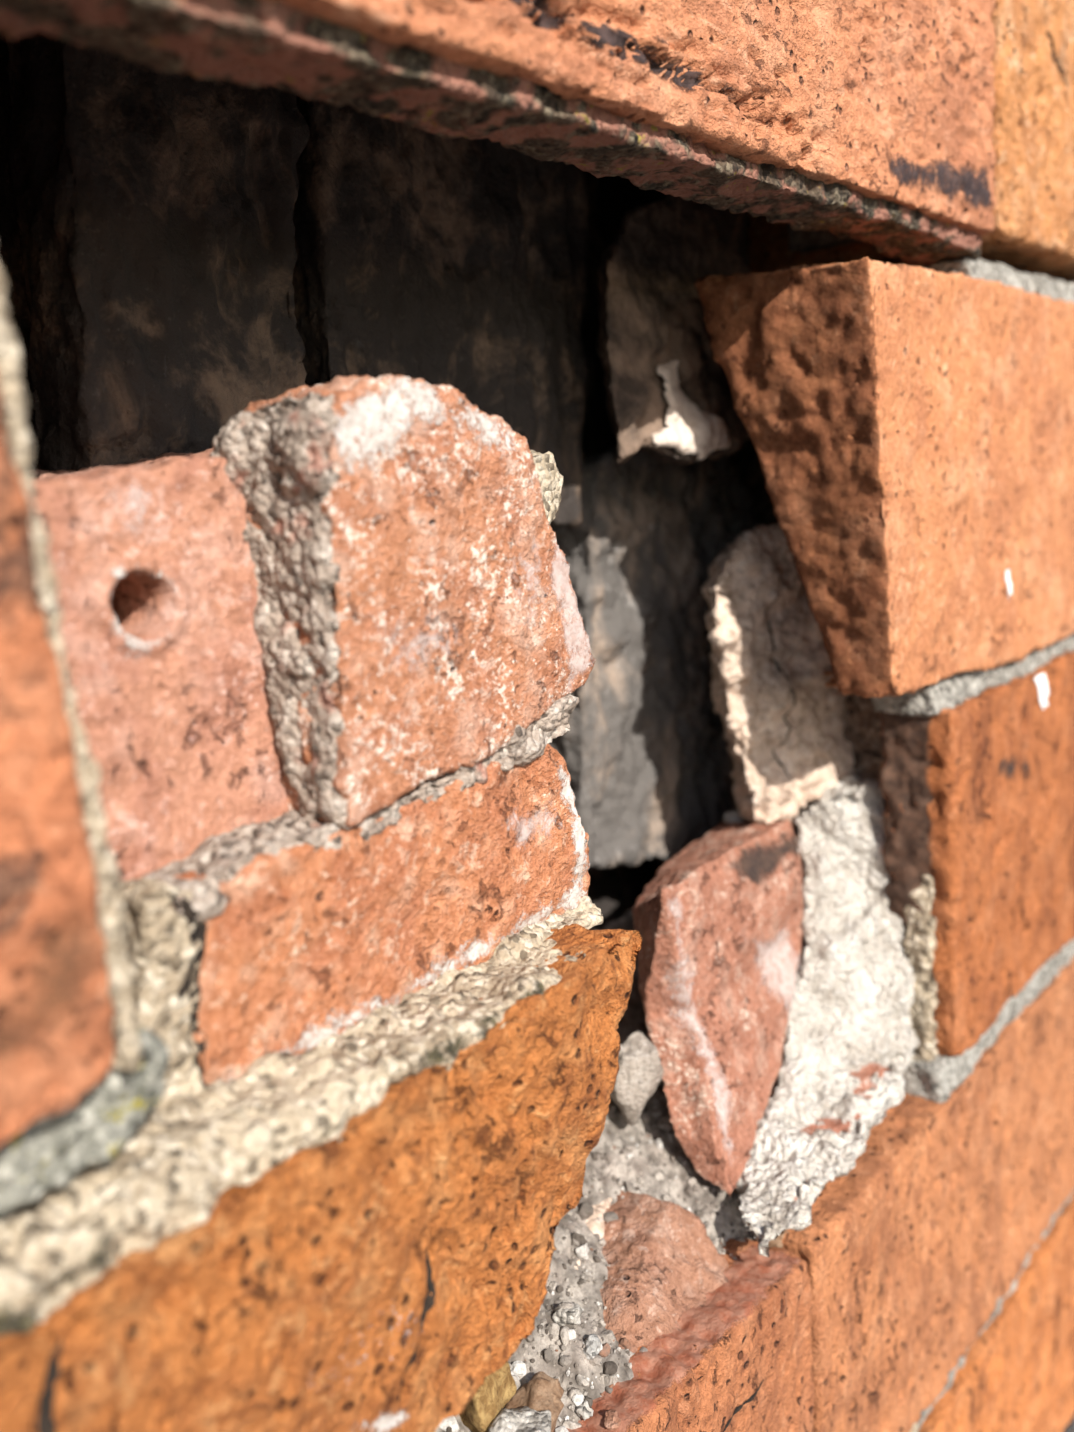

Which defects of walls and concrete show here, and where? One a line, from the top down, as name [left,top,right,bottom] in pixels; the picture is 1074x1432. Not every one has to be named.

peeling [651,360,730,460]
spalling [210,374,596,831]
spalling [800,1062,891,1136]
spalling [0,924,800,1432]
crack [723,1379,765,1432]